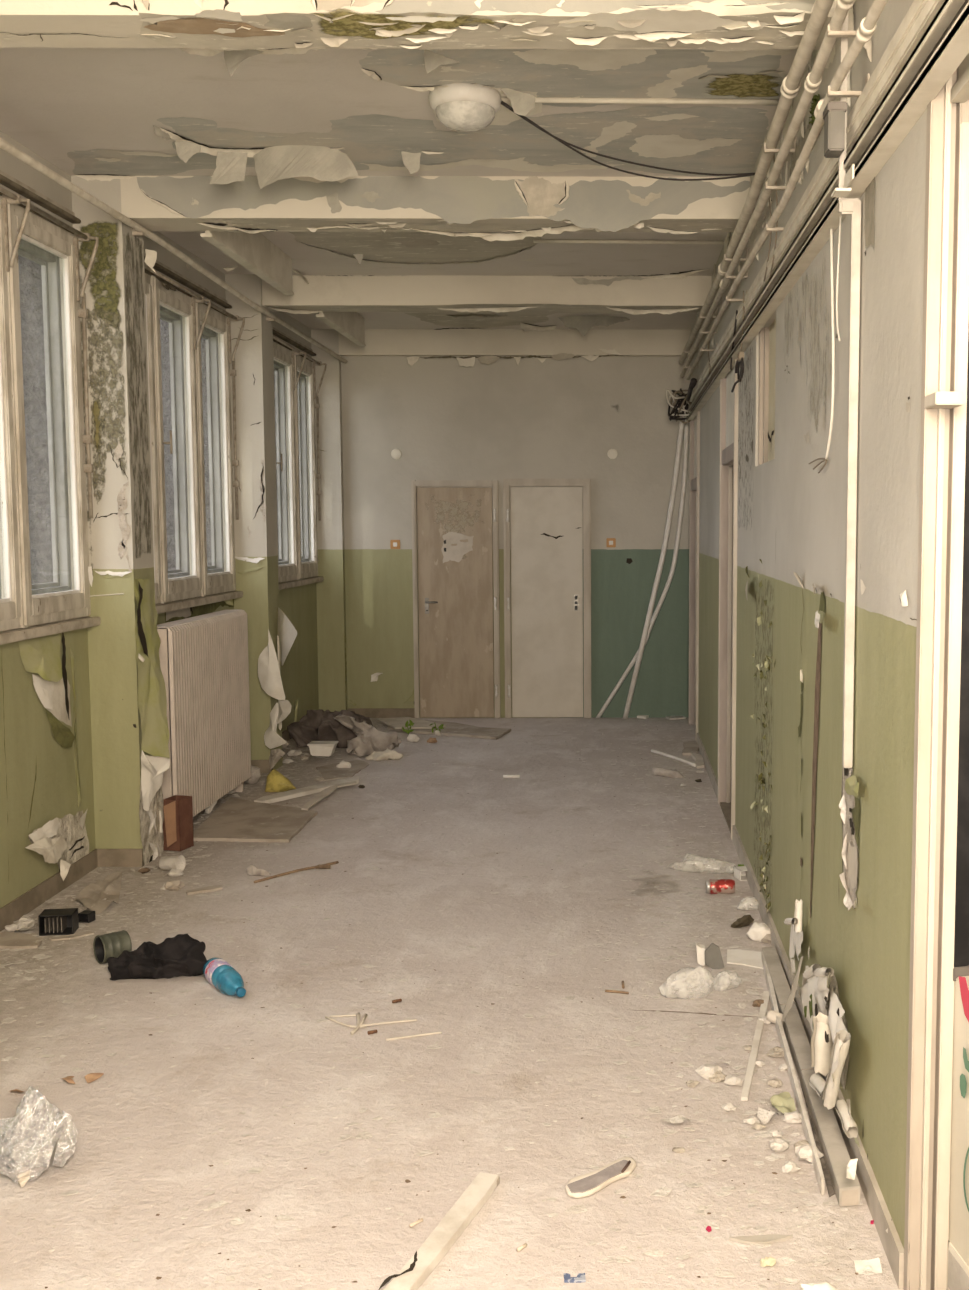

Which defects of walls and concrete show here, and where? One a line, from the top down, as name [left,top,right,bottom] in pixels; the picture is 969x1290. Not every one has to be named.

peeling [67,0,835,291]
mould [699,71,784,97]
peeling [864,39,872,62]
mould [80,235,151,558]
peeling [407,349,627,367]
peeling [235,557,265,574]
peeling [18,633,89,881]
peeling [88,482,234,866]
peeling [258,607,298,769]
spalling [839,767,860,911]
peeling [782,899,860,1180]